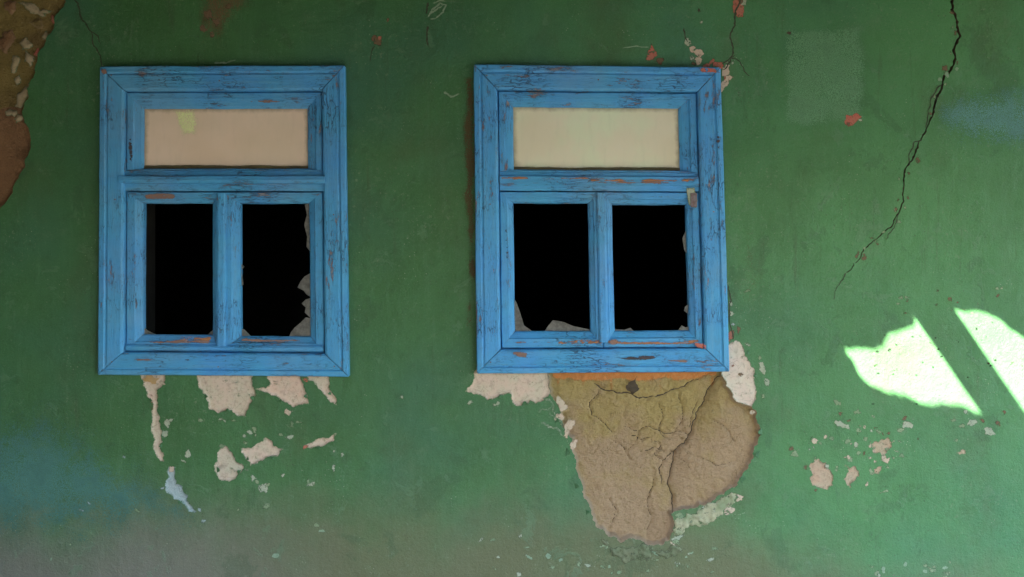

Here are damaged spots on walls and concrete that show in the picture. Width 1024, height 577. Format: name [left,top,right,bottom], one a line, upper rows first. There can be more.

spalling [0,0,66,207]
peeling [683,29,735,92]
peeling [844,113,862,127]
crack [834,0,961,299]
peeling [140,375,206,522]
peeling [197,375,337,509]
peeling [303,433,344,471]
spalling [466,285,769,575]
peeling [789,400,919,492]
peeling [951,410,1006,455]